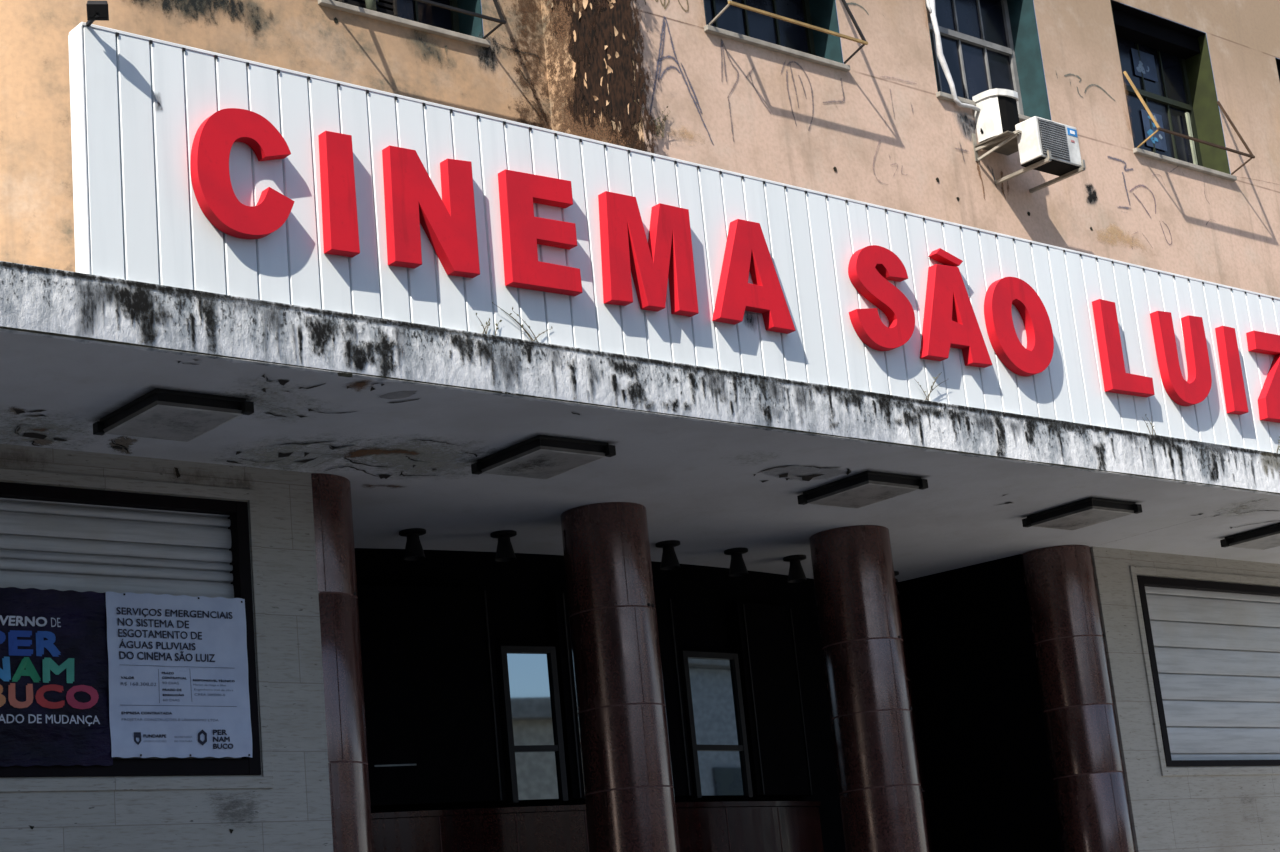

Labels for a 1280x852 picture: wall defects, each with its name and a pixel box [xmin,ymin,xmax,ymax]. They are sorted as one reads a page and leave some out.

damp [131,0,272,34]
damp [0,262,1280,494]
peeling [4,407,81,446]
peeling [109,436,137,454]
peeling [227,441,356,469]
peeling [754,465,851,483]